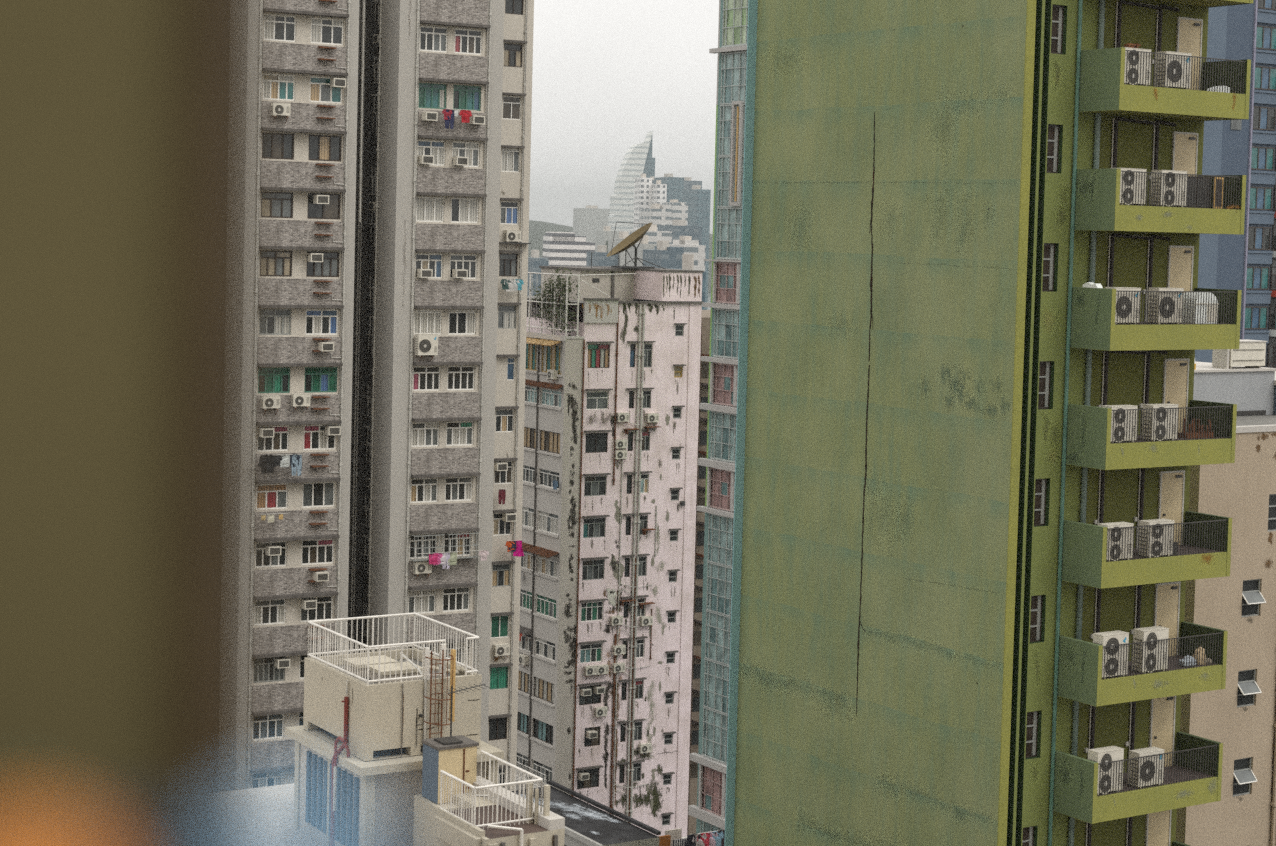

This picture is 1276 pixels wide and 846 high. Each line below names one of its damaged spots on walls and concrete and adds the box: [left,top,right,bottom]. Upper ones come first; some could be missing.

damp [620,275,691,342]
crack [856,112,875,714]
damp [564,371,675,690]
damp [521,687,669,834]
damp [583,681,612,717]